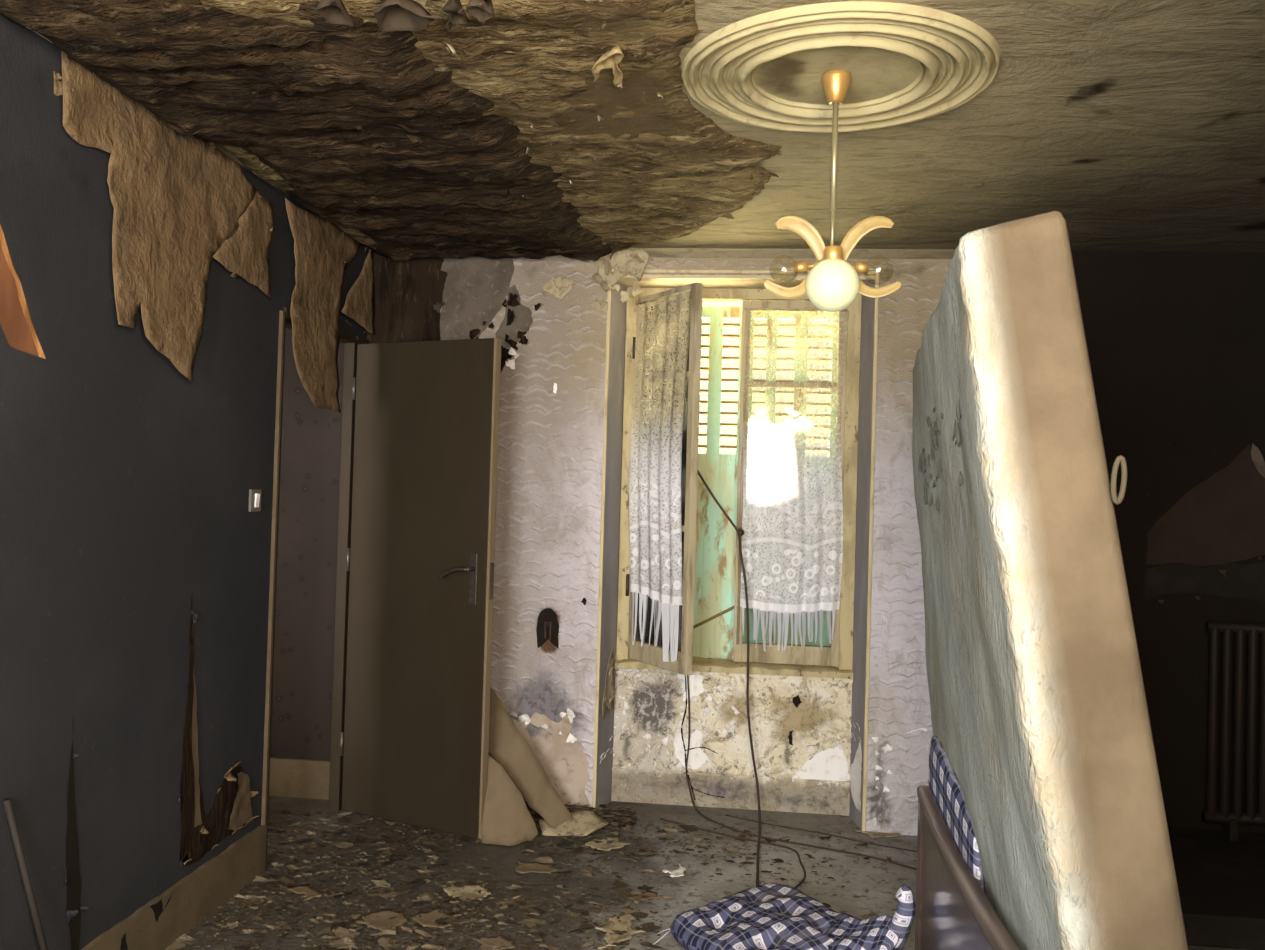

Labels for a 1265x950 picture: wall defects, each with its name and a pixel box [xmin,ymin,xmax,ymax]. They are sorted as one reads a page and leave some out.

flaking render [0,0,654,373]
flaking render [510,708,614,810]
leakage [775,698,832,763]